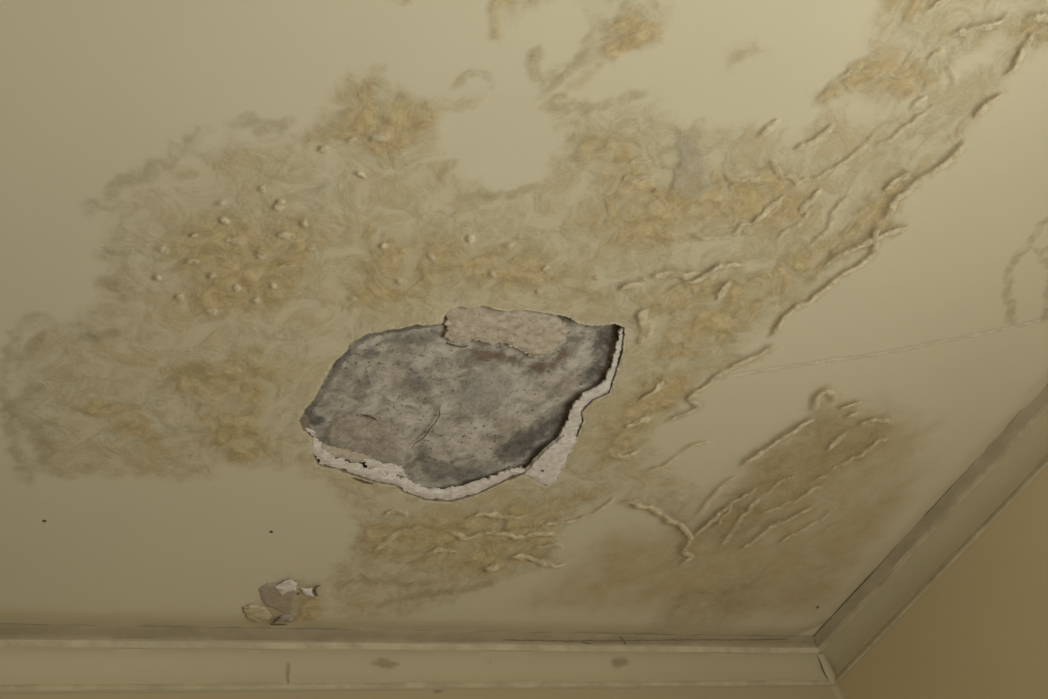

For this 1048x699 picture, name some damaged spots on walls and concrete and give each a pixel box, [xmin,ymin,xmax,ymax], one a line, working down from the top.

water stain [31,0,1048,518]
flaking render [299,306,625,502]
peeling [244,578,320,625]
water stain [332,476,566,613]